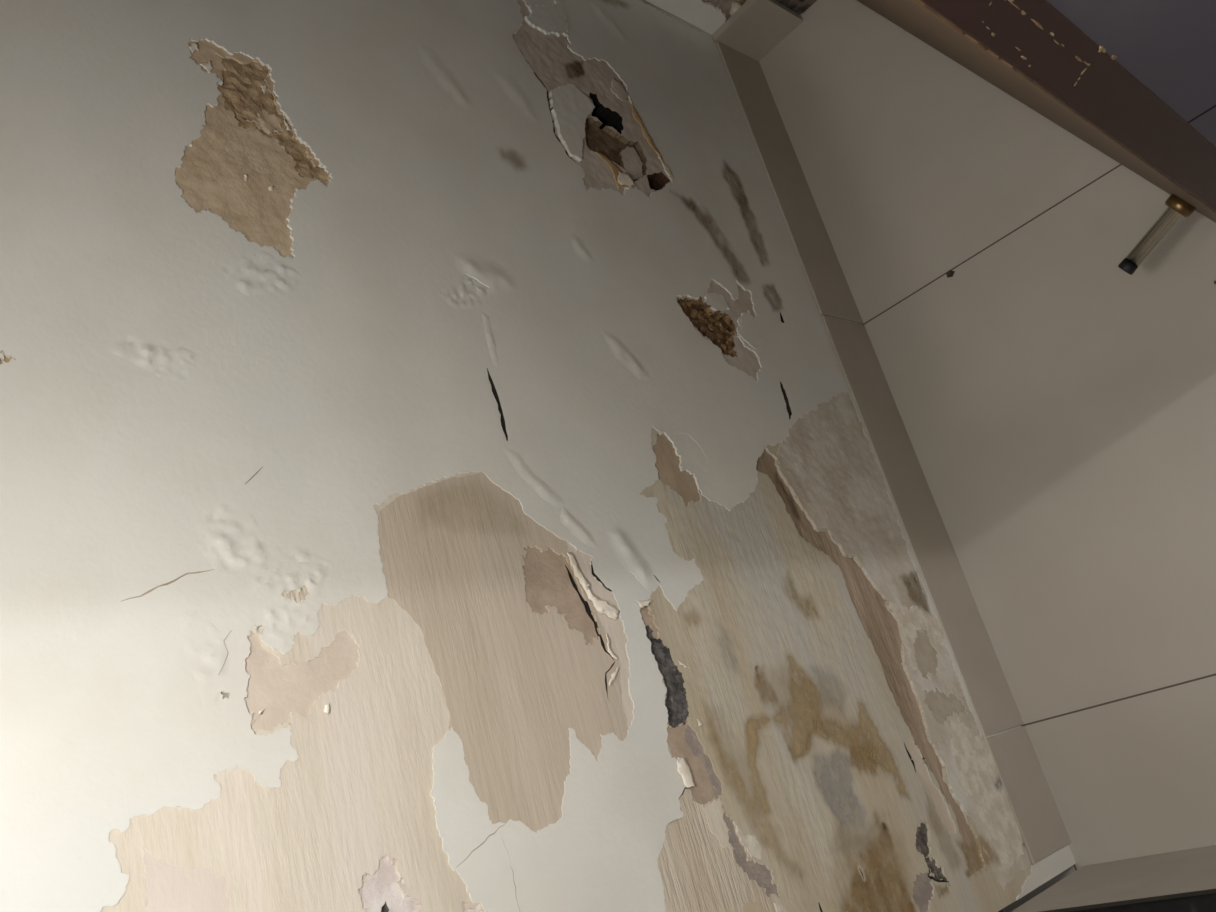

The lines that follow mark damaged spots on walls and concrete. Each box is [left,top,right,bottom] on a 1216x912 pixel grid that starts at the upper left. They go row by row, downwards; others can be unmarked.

spalling [175,39,331,258]
spalling [512,0,674,198]
spalling [702,0,747,22]
crack [487,369,508,441]
spalling [676,280,764,381]
peeling [100,471,634,912]
peeling [633,600,787,912]
damp [640,391,1033,912]
spalling [756,449,983,876]
spalling [913,823,949,912]